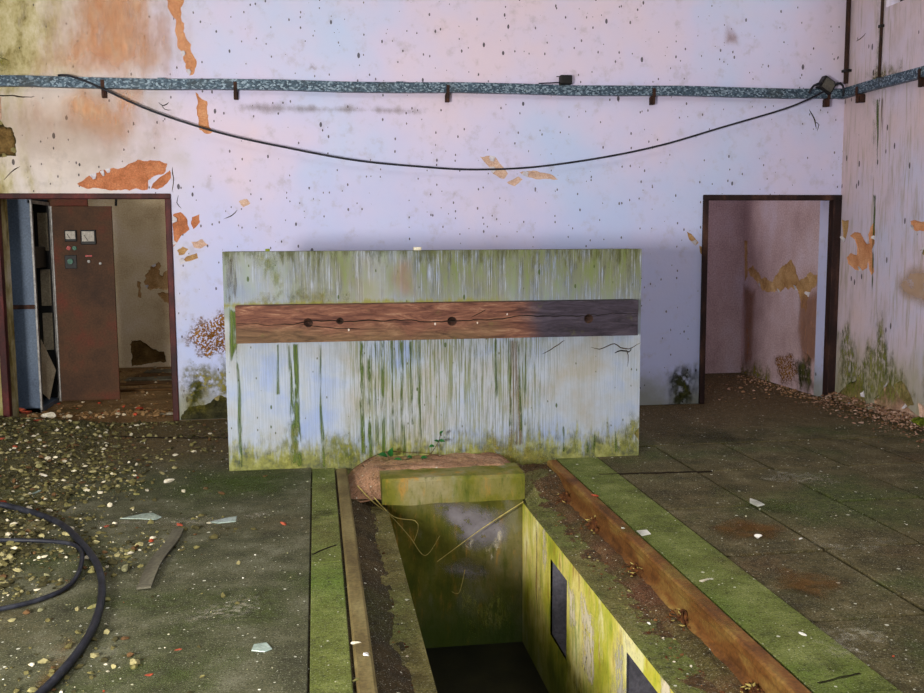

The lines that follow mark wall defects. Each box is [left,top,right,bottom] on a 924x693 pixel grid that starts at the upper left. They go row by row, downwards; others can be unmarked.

peeling [167,0,197,75]
spalling [0,97,17,157]
peeling [196,93,212,134]
peeling [77,160,171,191]
peeling [172,212,208,265]
peeling [744,240,817,303]
peeling [840,220,875,275]
leakage [229,298,237,359]
leakage [277,344,302,466]
leakage [368,341,422,457]
leakage [508,341,526,444]
leakage [568,585,594,684]